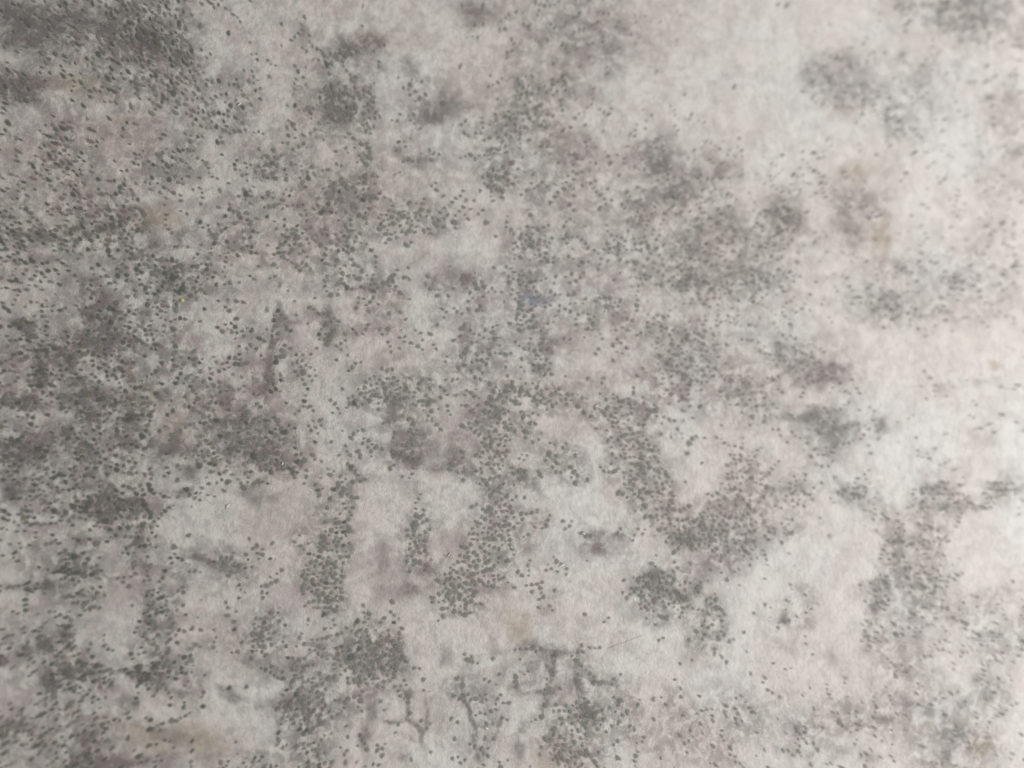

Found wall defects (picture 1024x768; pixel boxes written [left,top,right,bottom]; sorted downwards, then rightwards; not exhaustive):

damp [0,0,457,768]
damp [231,75,823,768]
damp [864,509,1008,662]
damp [912,481,1008,542]